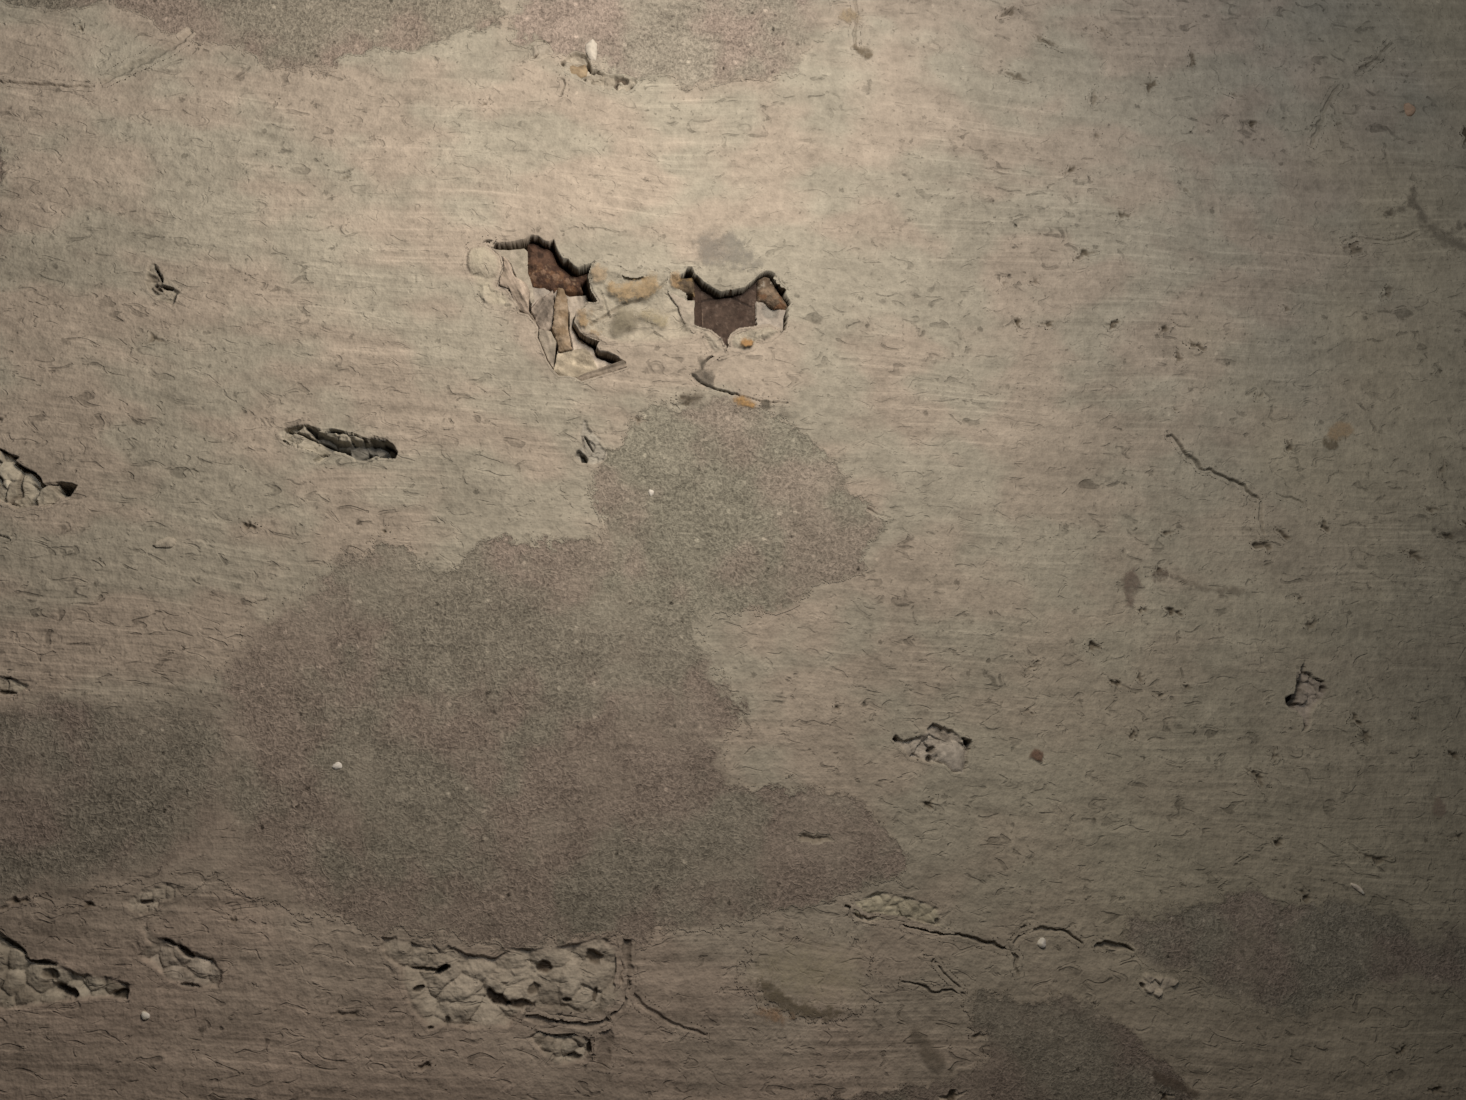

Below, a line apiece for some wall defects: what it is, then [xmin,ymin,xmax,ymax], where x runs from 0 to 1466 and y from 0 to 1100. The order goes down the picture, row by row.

corrosion [527,243,695,335]
spalling [490,232,794,383]
corrosion [757,277,788,310]
crack [1164,429,1307,538]
peeling [0,387,909,951]
peeling [1116,883,1466,1027]